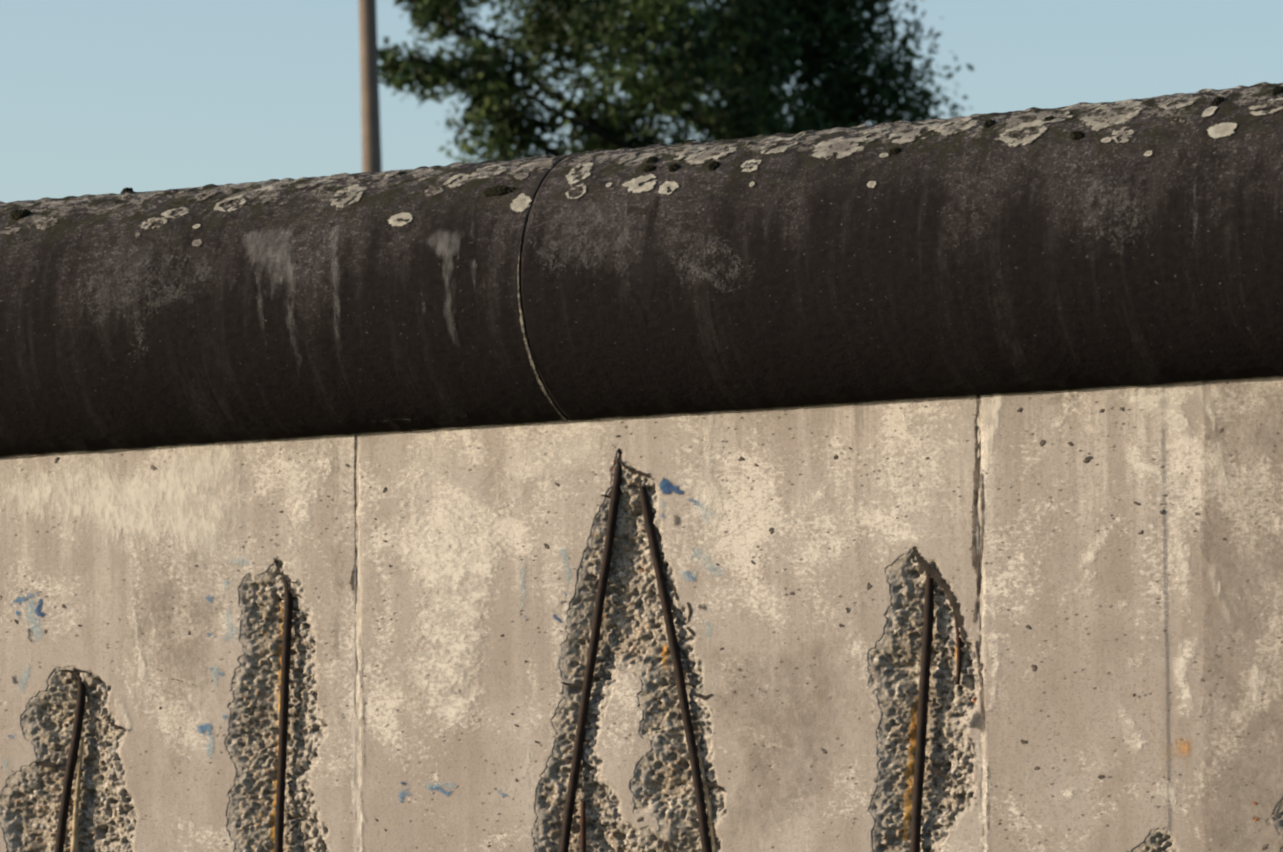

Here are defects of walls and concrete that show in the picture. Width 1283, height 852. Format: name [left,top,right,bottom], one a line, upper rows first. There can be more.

spalling [0,666,139,852]
rust [259,599,284,852]
spalling [226,557,330,852]
spalling [532,445,727,852]
rust [903,690,919,840]
spalling [869,548,983,852]
crack [912,395,989,852]
spalling [1267,800,1283,852]